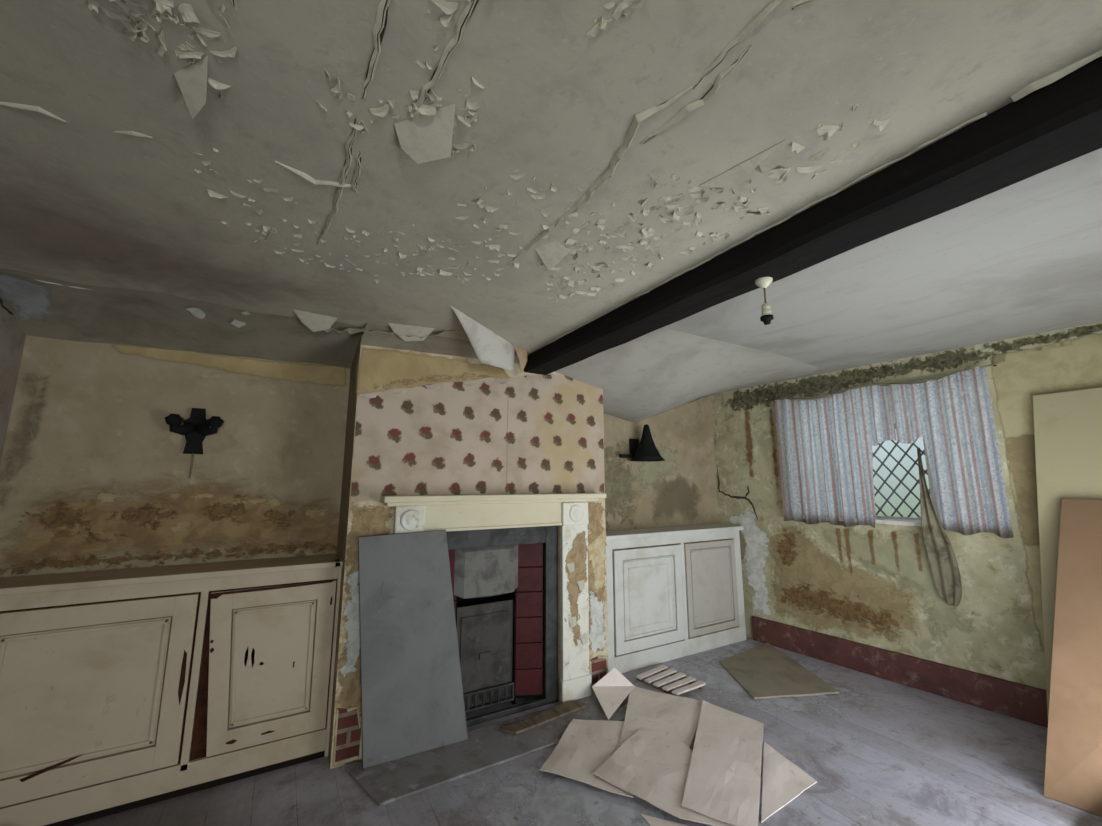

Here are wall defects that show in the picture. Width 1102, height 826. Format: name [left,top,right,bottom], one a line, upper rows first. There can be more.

peeling [88,0,237,119]
peeling [325,70,485,164]
peeling [425,0,471,27]
peeling [1011,49,1102,102]
peeling [207,112,987,344]
spalling [0,274,52,320]
spalling [186,307,206,319]
damp [0,483,339,575]
spalling [332,505,392,767]
spalling [565,502,608,689]
damp [770,527,971,641]